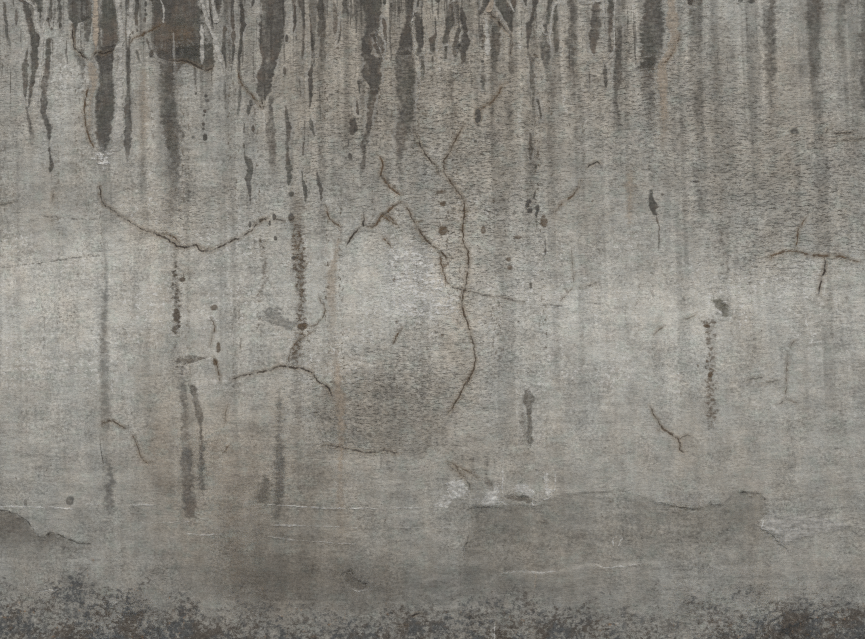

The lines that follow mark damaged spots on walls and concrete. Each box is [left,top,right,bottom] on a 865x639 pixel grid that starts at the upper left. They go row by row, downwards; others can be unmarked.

leakage [3,0,341,172]
leakage [348,0,470,160]
leakage [480,0,621,117]
leakage [638,0,679,106]
crack [99,186,294,251]
leakage [243,143,253,201]
leakage [286,148,323,201]
crack [326,87,513,408]
leakage [649,190,664,230]
crack [770,219,861,292]
crack [214,299,332,396]
peeling [761,515,848,544]